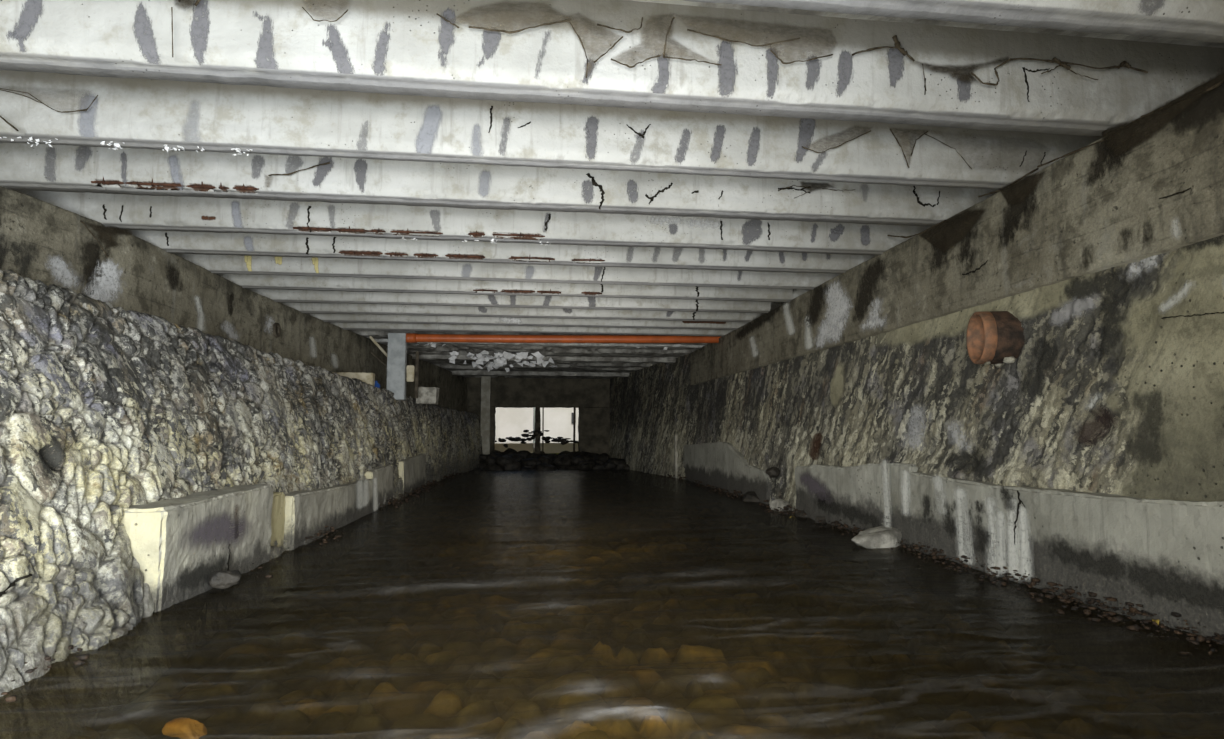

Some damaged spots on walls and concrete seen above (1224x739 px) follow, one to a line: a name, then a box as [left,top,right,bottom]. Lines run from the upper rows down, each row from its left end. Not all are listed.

leakage [6,0,42,52]
leakage [133,4,159,64]
leakage [190,0,209,65]
leakage [254,13,277,69]
leakage [322,25,353,74]
leakage [373,23,390,76]
crack [1022,67,1050,102]
crack [586,173,605,210]
crack [645,182,723,240]
crack [1013,490,1025,544]